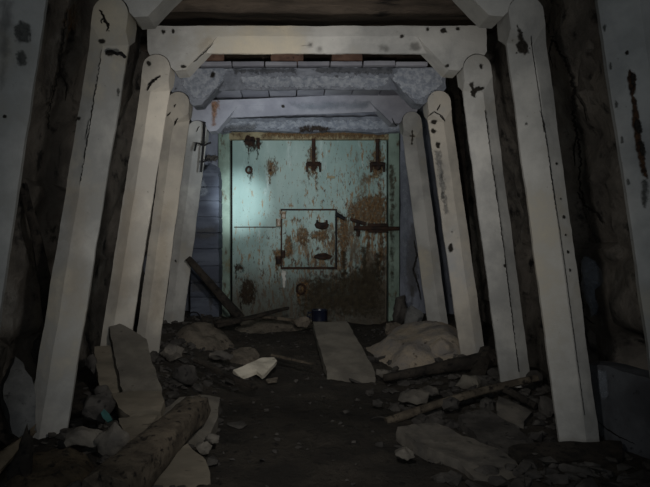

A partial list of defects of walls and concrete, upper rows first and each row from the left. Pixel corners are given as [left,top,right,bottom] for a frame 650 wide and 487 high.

crack [99,10,110,31]
spalling [516,25,530,55]
corrosion [627,70,648,179]
corrosion [265,132,394,318]
corrosion [234,264,256,309]